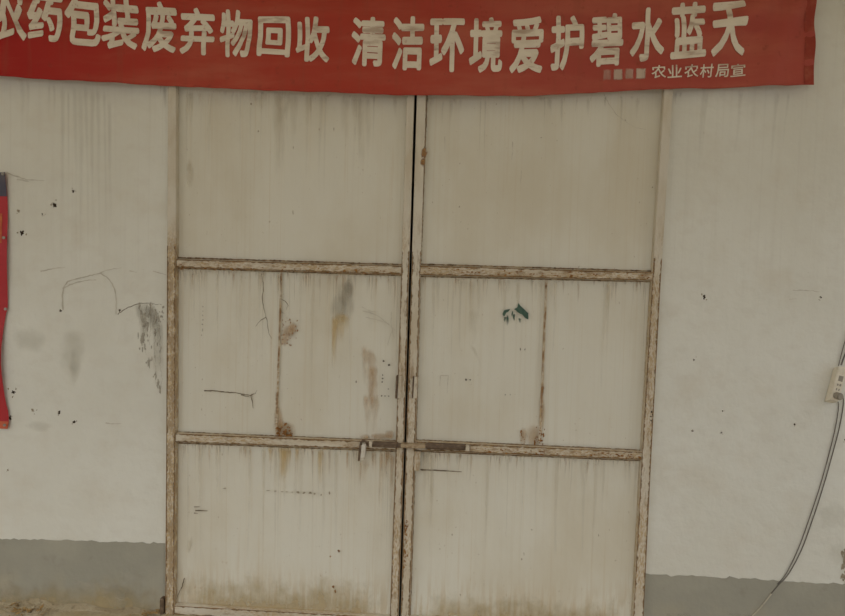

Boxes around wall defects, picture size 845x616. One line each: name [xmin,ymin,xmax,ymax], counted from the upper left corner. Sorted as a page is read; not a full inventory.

rust [165,246,662,616]